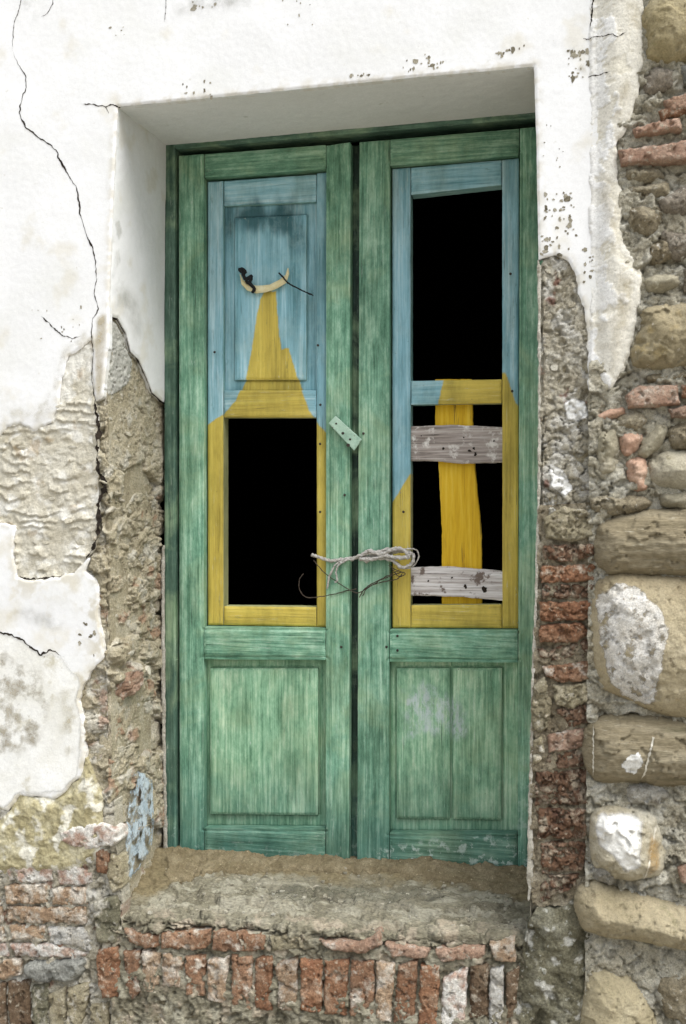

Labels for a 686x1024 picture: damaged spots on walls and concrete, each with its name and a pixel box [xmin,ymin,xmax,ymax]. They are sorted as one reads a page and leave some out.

crack [12,1,165,559]
peeling [538,0,644,515]
crack [583,0,625,40]
crack [0,632,59,656]
flaking render [0,319,197,1024]